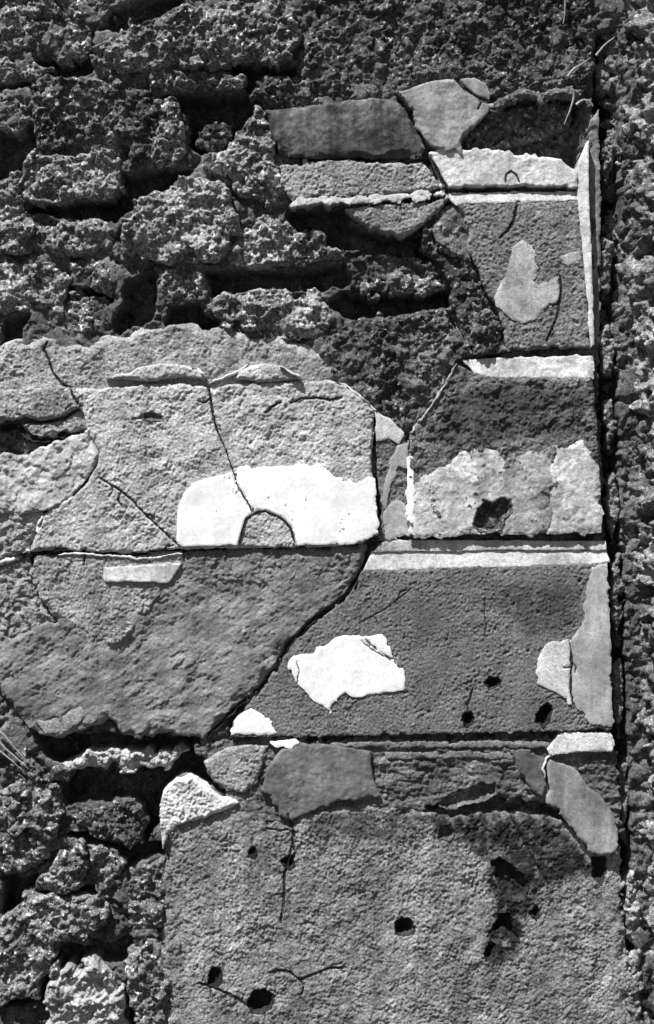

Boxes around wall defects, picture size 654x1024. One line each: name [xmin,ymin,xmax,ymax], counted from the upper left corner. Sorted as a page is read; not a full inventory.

spalling [463,100,573,152]
crack [18,341,82,442]
crack [198,387,295,544]
crack [54,478,189,565]
crack [206,562,364,738]
crack [269,815,296,923]
crack [200,983,247,1005]
crack [270,967,345,993]